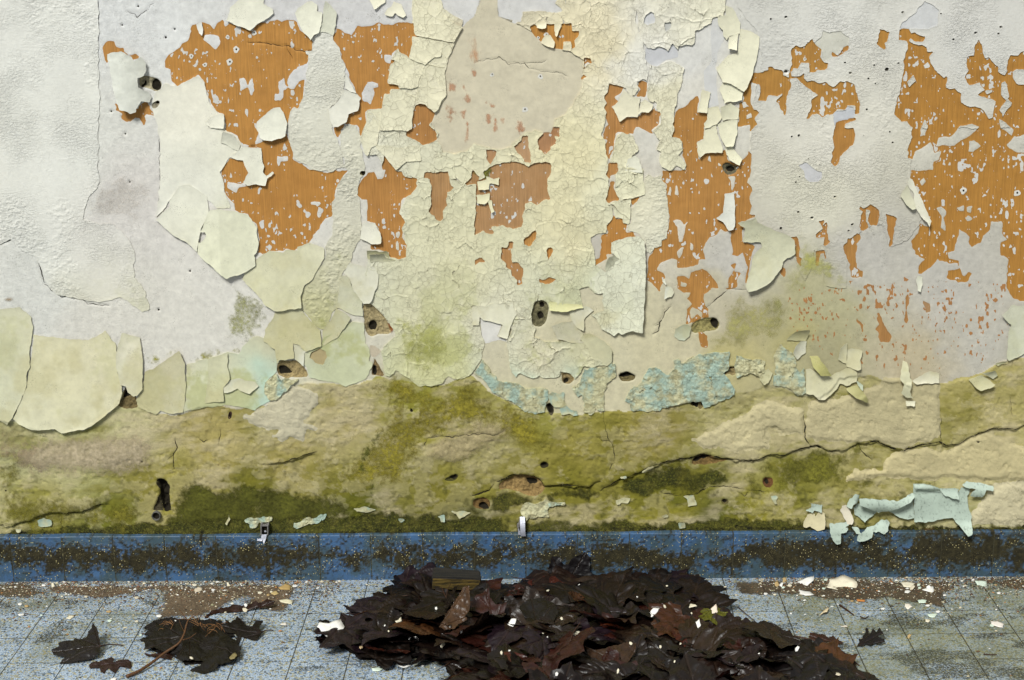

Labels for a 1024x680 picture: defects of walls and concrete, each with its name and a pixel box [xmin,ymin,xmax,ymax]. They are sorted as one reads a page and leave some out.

peeling [0,0,868,433]
peeling [787,1,1024,407]
crack [2,504,103,527]
crack [472,401,1024,496]